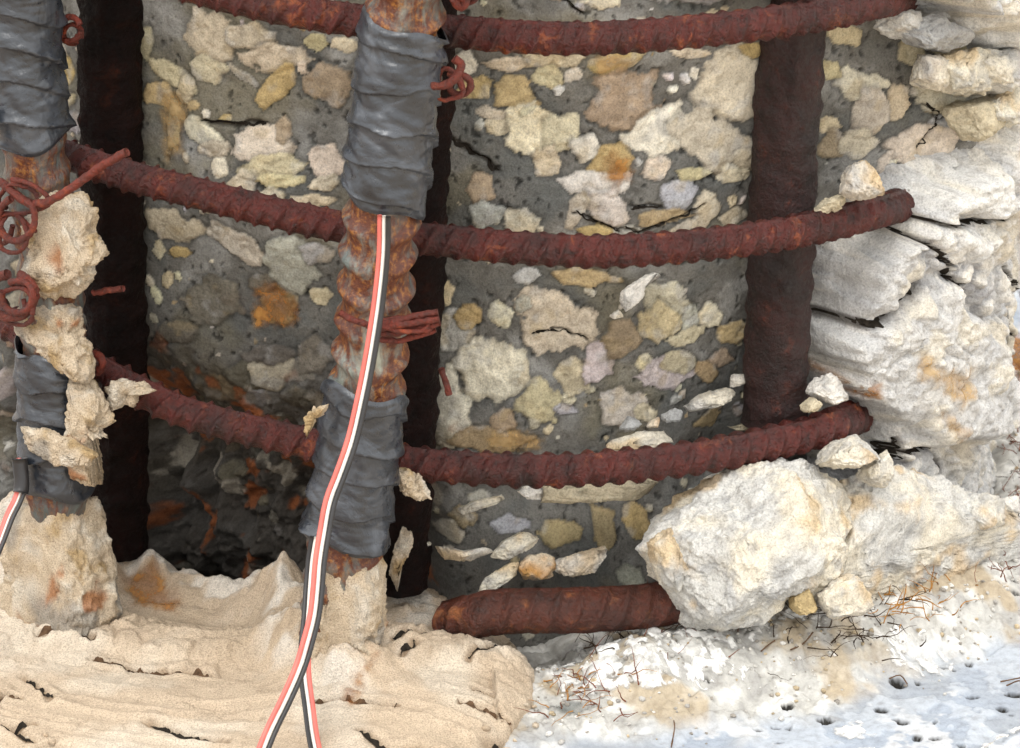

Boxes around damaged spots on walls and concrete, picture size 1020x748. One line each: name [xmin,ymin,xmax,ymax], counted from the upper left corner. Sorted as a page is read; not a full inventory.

spalling [61,0,81,143]
spalling [141,0,359,210]
spalling [446,40,761,236]
spalling [457,0,771,22]
rust [609,159,628,181]
spalling [814,9,1020,208]
spalling [143,196,344,429]
spalling [435,256,748,455]
rust [837,376,879,397]
spalling [147,414,315,580]
spalling [427,468,726,600]
spalling [504,633,567,648]